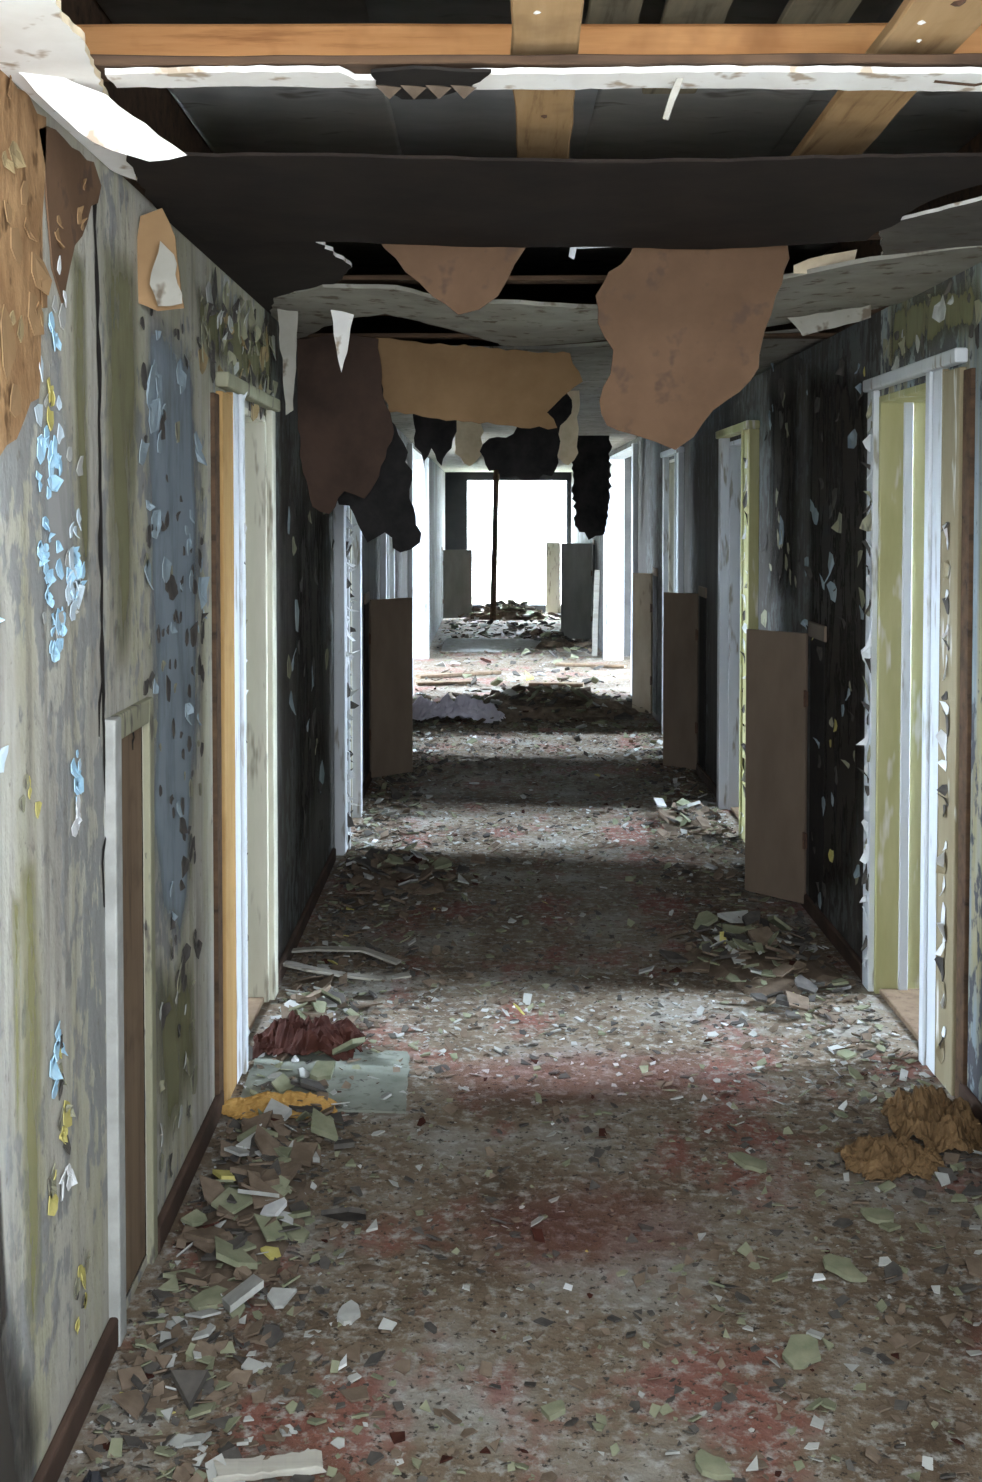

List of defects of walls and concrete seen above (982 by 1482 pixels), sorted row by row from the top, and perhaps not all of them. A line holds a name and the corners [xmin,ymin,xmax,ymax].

spalling [371,65,491,100]
spalling [0,70,101,663]
peeling [740,357,873,968]
peeling [936,522,951,817]
peeling [934,841,947,1064]